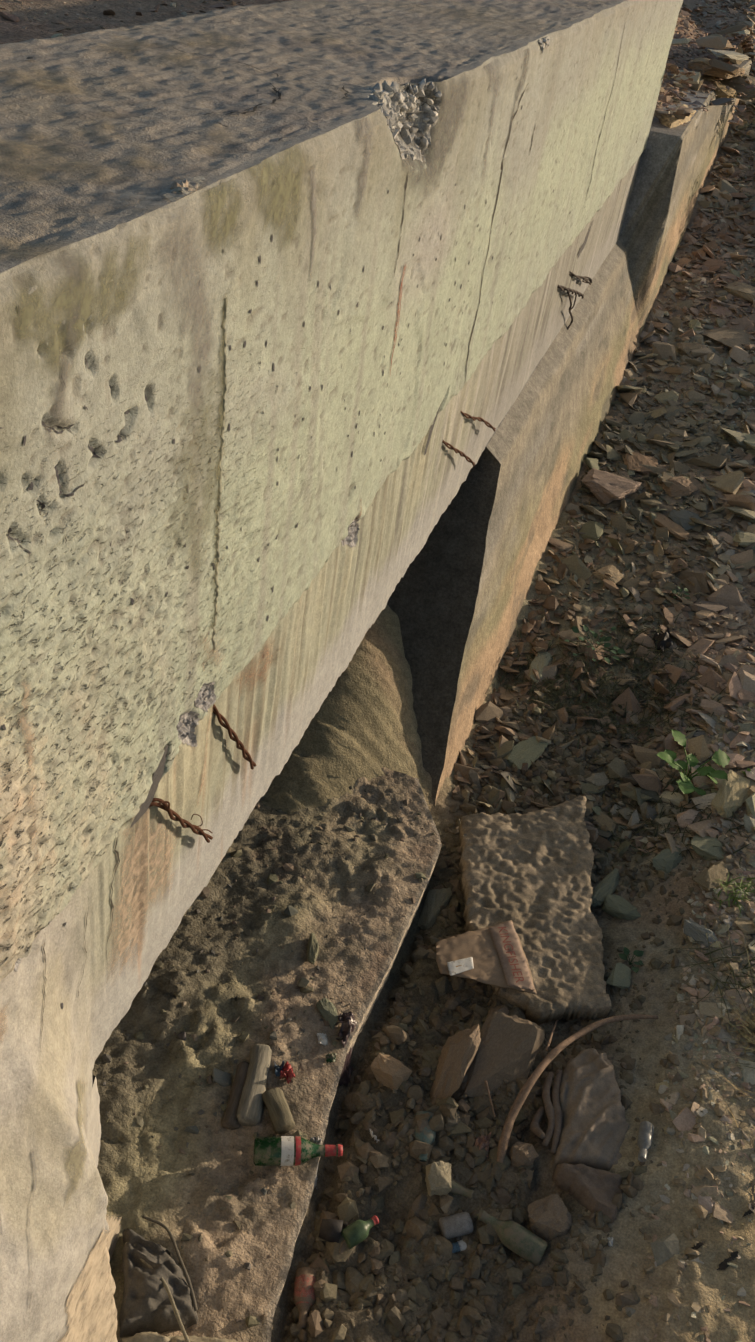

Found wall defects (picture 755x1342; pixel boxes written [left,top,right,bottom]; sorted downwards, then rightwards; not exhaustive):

crack [170,47,349,127]
crack [465,83,536,380]
water stain [18,250,137,431]
spalling [176,682,216,747]